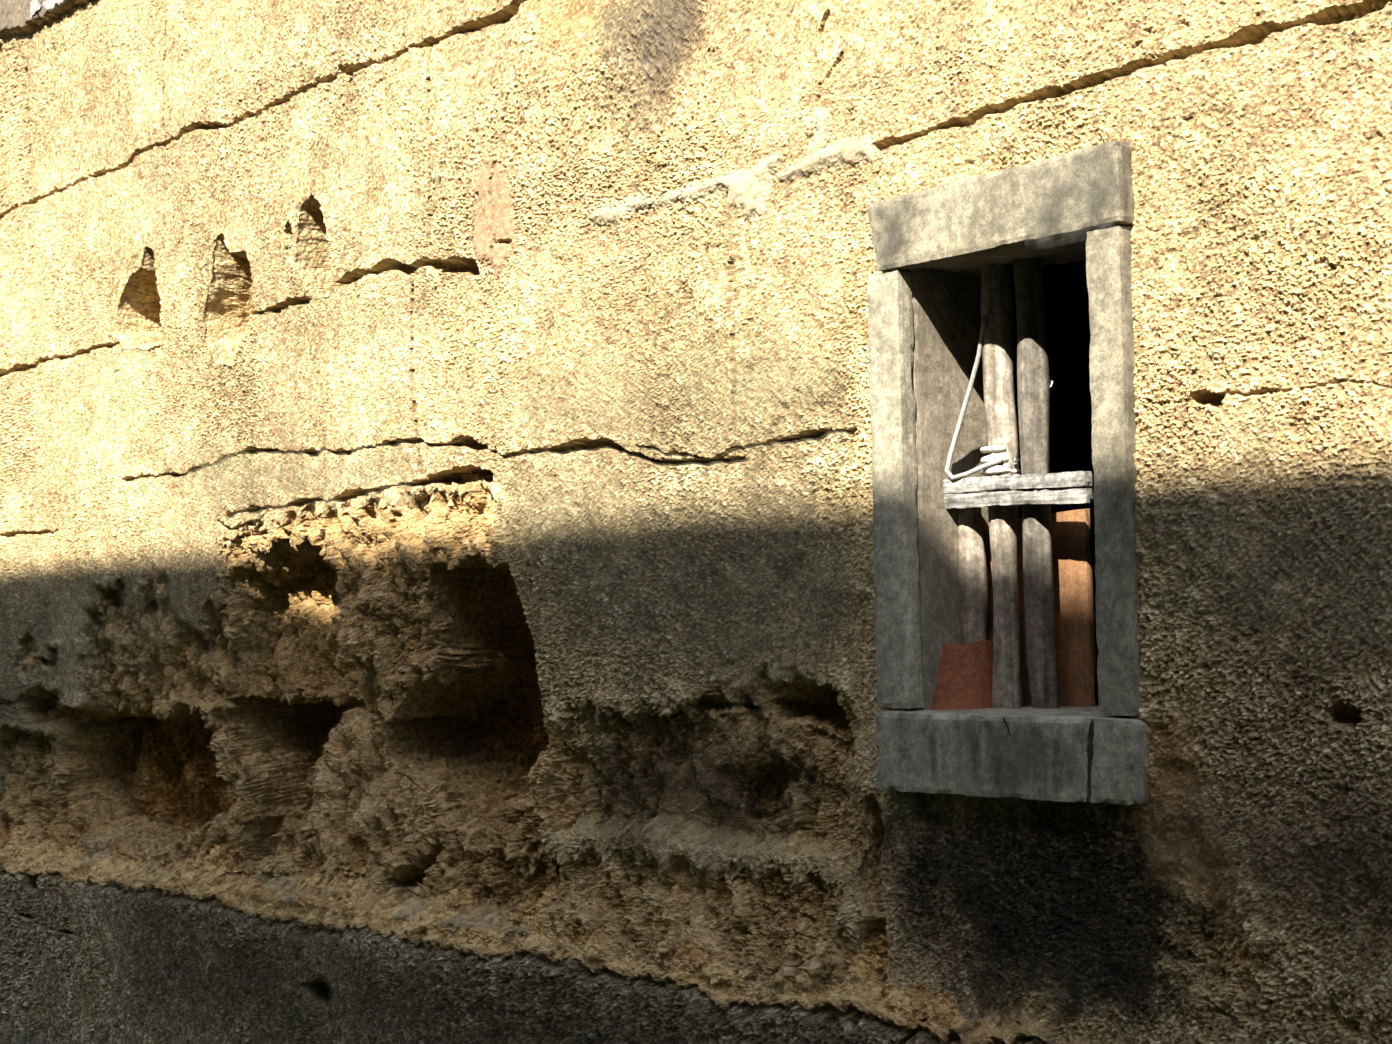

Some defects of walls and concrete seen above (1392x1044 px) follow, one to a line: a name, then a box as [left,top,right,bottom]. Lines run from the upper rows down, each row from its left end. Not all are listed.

crack [0,0,529,218]
crack [875,0,1392,152]
crack [0,341,120,378]
crack [254,255,480,395]
crack [1158,377,1392,405]
crack [124,427,858,541]
spalling [0,465,891,994]
spalling [1327,699,1363,731]
spalling [1138,708,1392,1044]
spalling [304,976,334,1007]